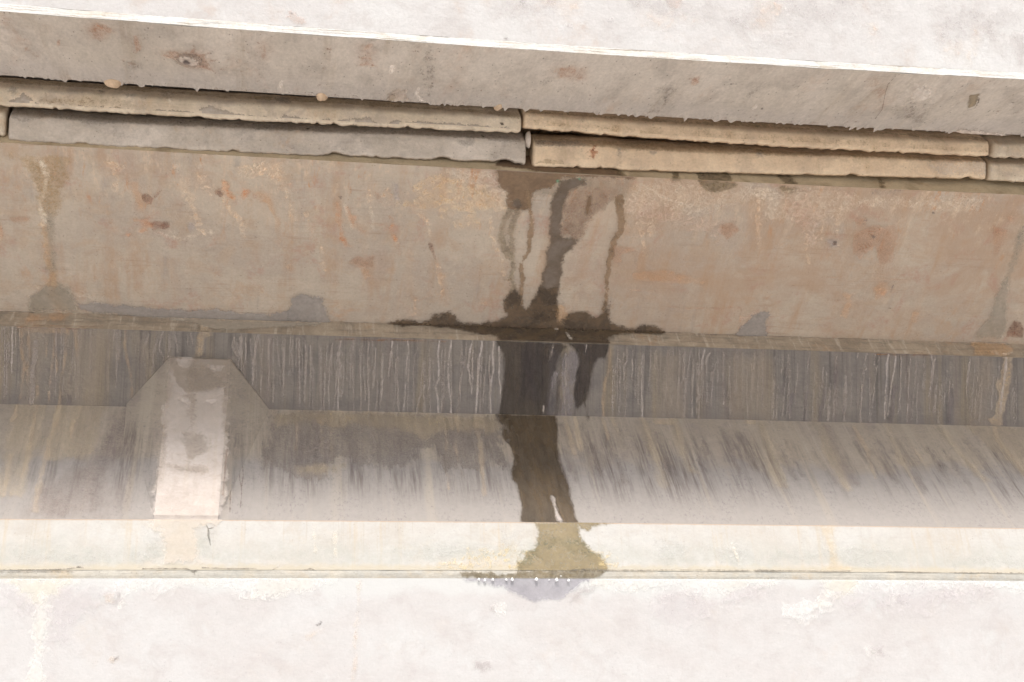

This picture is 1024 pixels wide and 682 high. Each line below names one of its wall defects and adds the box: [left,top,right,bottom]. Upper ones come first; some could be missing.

water stain [231,155,1024,624]